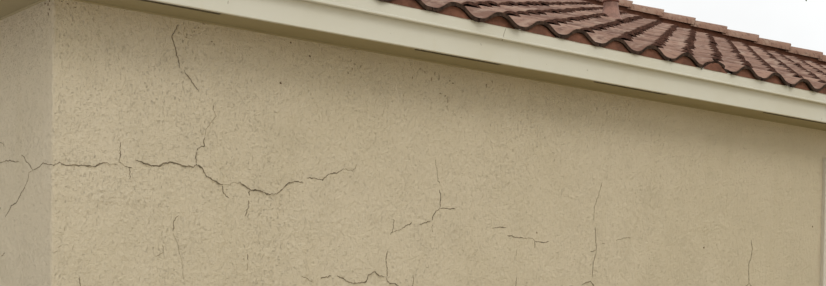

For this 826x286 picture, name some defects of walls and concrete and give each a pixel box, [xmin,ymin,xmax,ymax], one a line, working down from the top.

crack [0,25,357,217]
crack [302,160,455,286]
crack [582,184,630,286]